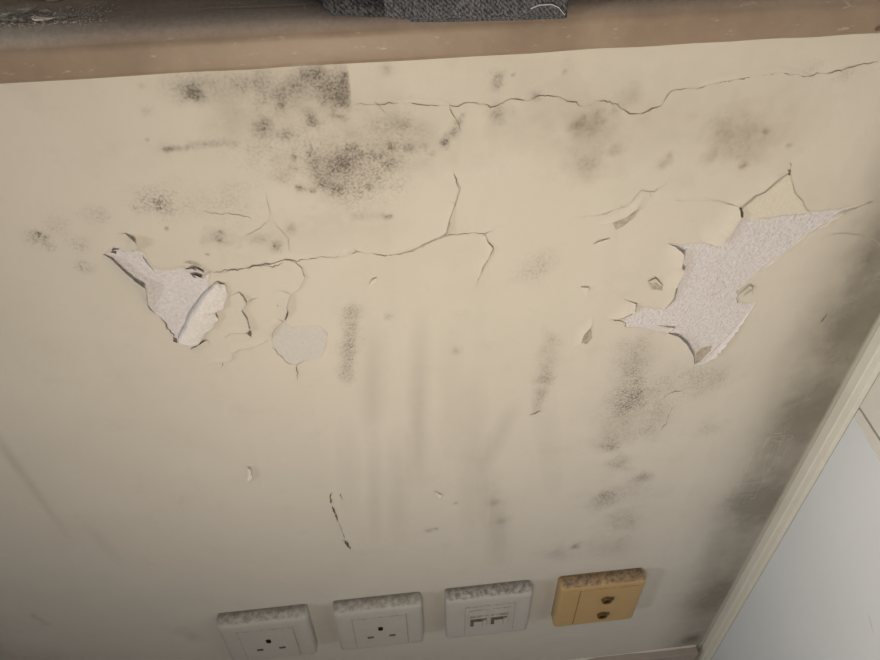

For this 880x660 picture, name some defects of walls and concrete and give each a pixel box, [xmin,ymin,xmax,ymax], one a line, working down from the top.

damp [292,70,349,107]
crack [353,62,874,129]
peeling [101,233,328,380]
crack [205,176,494,283]
peeling [607,167,872,370]
damp [779,230,880,445]
damp [734,472,785,524]
damp [699,581,732,611]